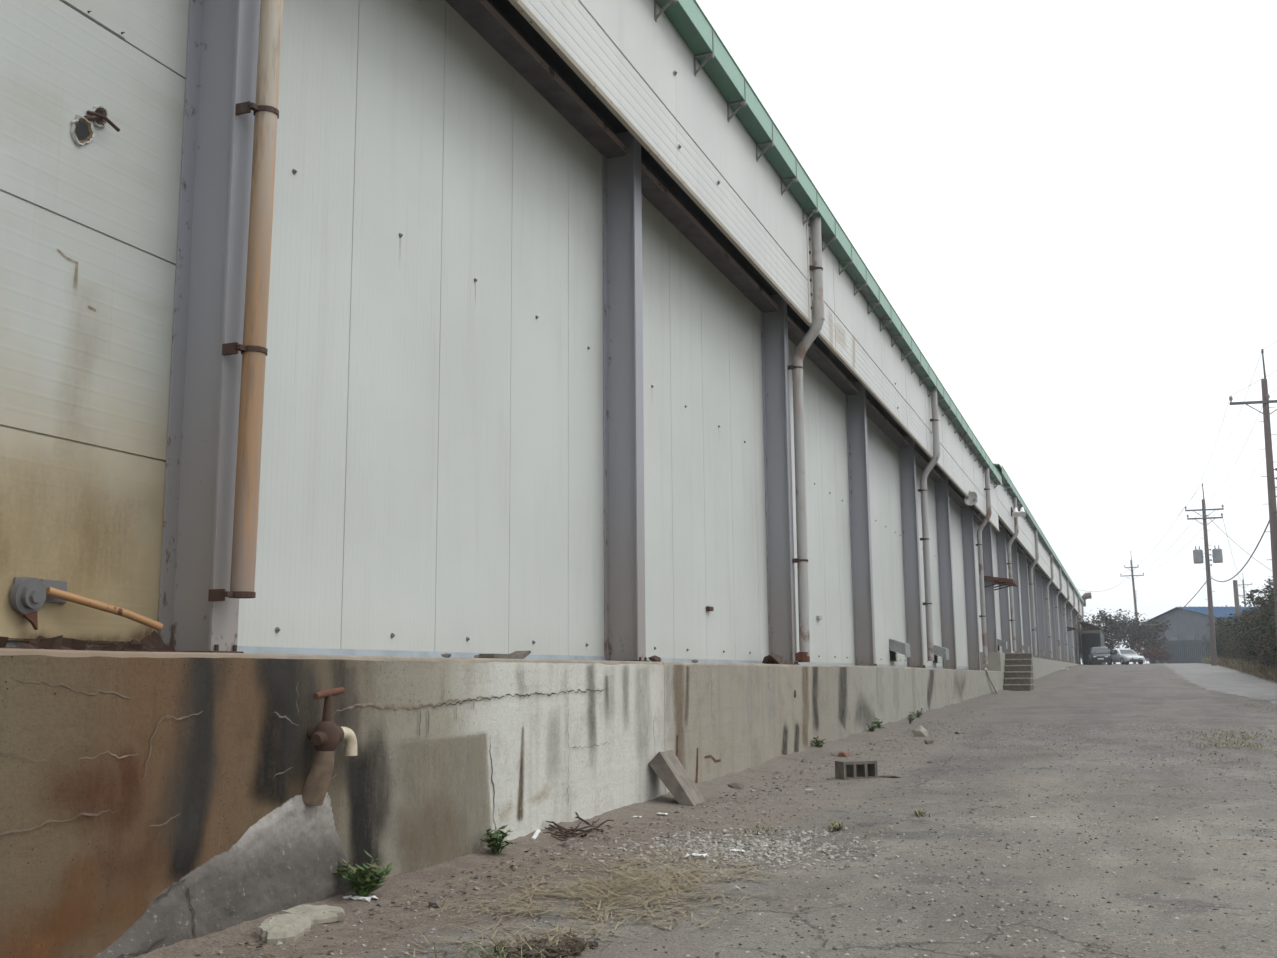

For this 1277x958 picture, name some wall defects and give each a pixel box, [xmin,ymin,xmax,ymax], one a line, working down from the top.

crack [84,711,202,782]
water stain [169,658,216,878]
crack [273,684,299,726]
water stain [255,659,317,803]
water stain [350,741,388,872]
crack [332,678,610,831]
water stain [667,665,688,764]
water stain [782,666,819,755]